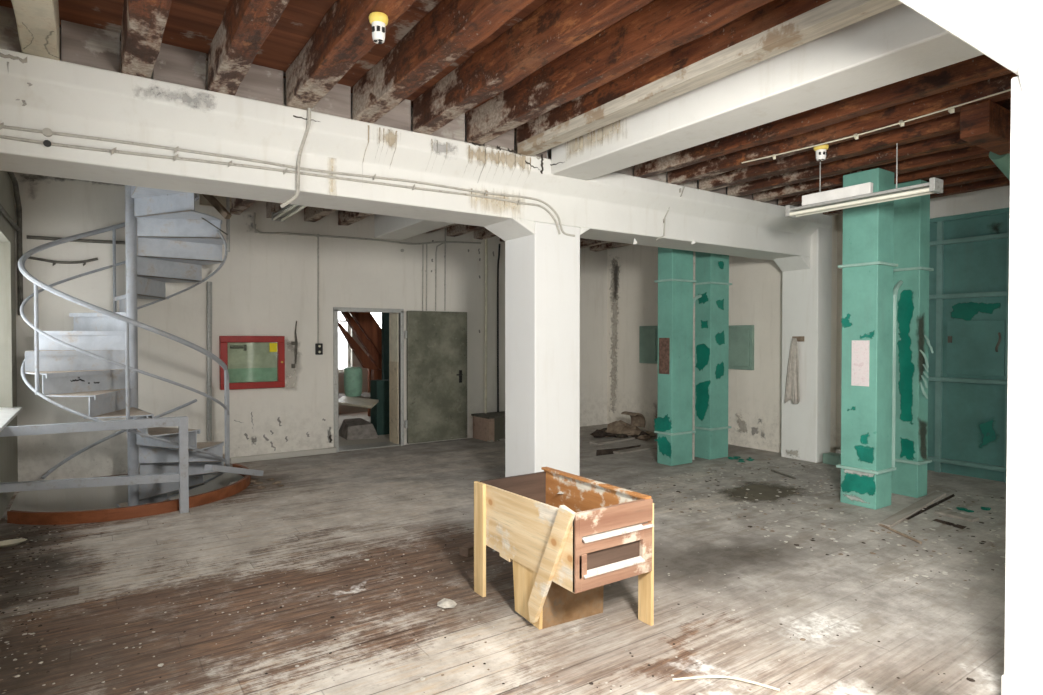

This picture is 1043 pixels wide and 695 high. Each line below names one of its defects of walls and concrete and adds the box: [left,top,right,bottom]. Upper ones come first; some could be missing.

leakage [365,125,397,151]
leakage [431,139,451,154]
leakage [469,145,531,169]
peeling [698,292,724,310]
peeling [951,302,1001,321]
peeling [695,320,725,421]
peeling [897,290,933,460]
peeling [841,433,876,503]